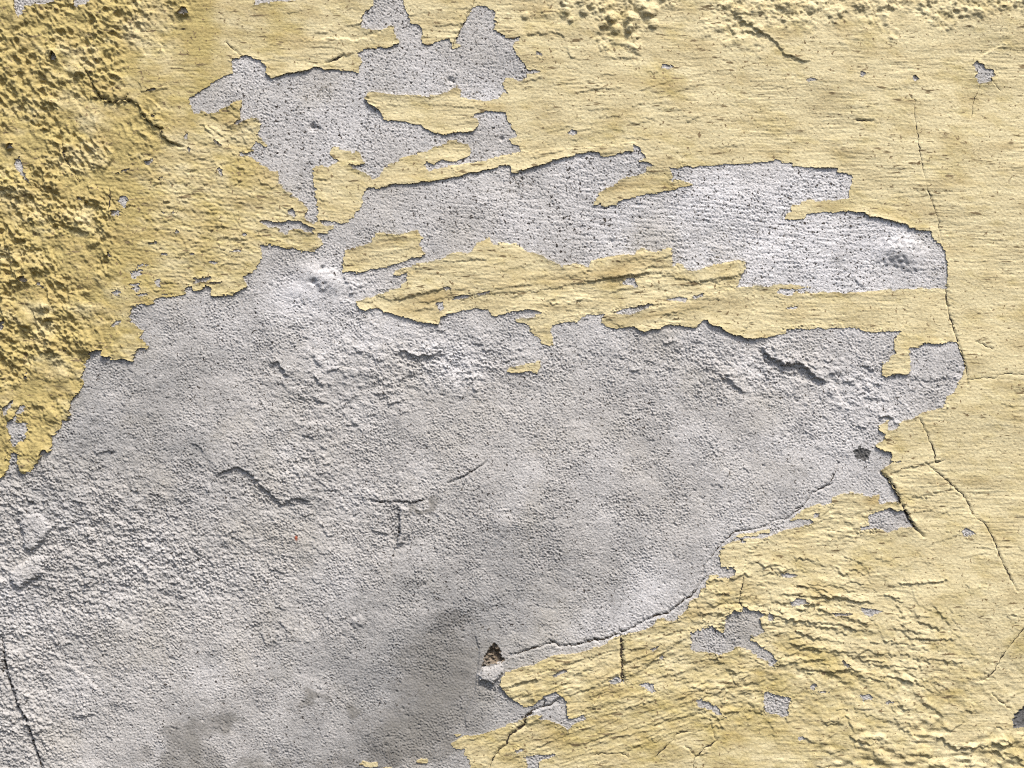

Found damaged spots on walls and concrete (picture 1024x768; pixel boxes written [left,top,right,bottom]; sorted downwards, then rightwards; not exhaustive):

peeling [14,0,54,18]
peeling [189,0,540,224]
peeling [972,61,995,84]
crack [945,289,1023,383]
peeling [0,144,976,768]
crack [881,473,923,536]
crack [920,419,1013,581]
crack [513,469,837,681]
crack [2,638,43,766]
crack [979,628,1024,707]
spalling [1012,706,1024,728]